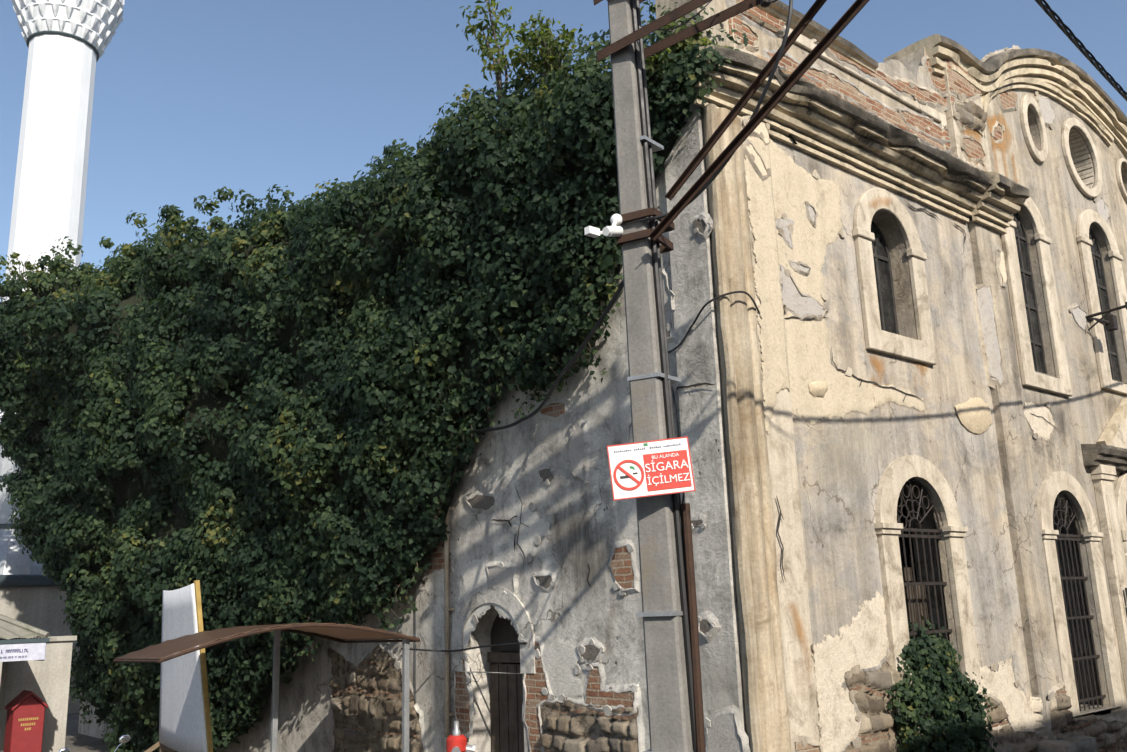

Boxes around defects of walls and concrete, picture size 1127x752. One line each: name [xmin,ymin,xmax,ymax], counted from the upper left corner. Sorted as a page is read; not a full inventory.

flaking render [724,0,1021,165]
spalling [1034,91,1055,130]
flaking render [741,115,926,434]
crack [831,348,925,402]
flaking render [327,642,428,752]
flaking render [453,653,475,738]
flaking render [518,634,645,752]
flaking render [791,736,822,752]
flaking render [842,649,905,752]